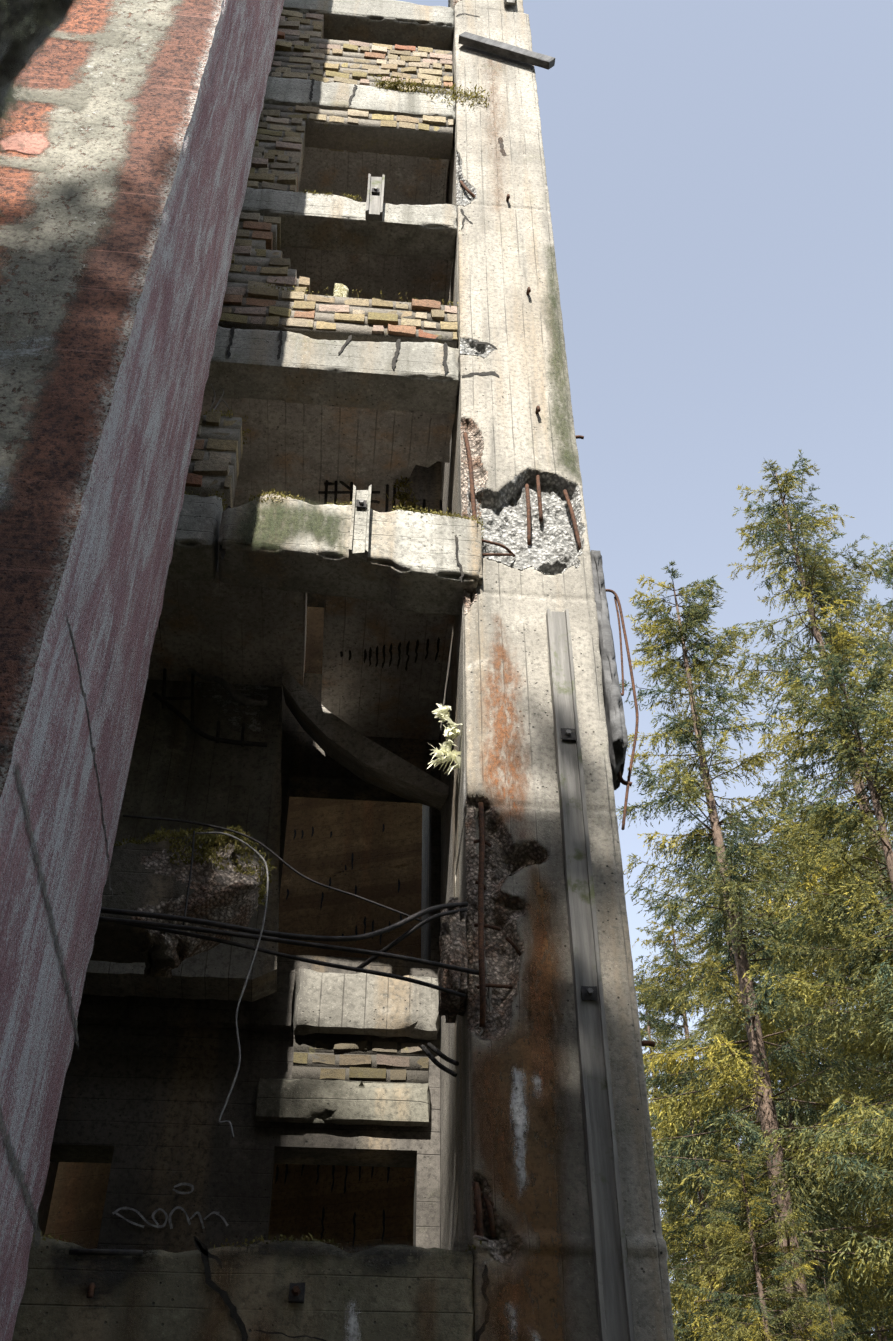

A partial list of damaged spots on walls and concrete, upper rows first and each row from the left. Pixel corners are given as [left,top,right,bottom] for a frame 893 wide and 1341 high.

spalling [318,480,353,505]
spalling [371,484,396,512]
spalling [460,417,585,575]
spalling [464,584,479,614]
corrosion [484,644,525,822]
spalling [465,794,549,1041]
corrosion [475,870,569,1341]
spalling [472,1173,523,1266]
crack [193,1236,326,1341]